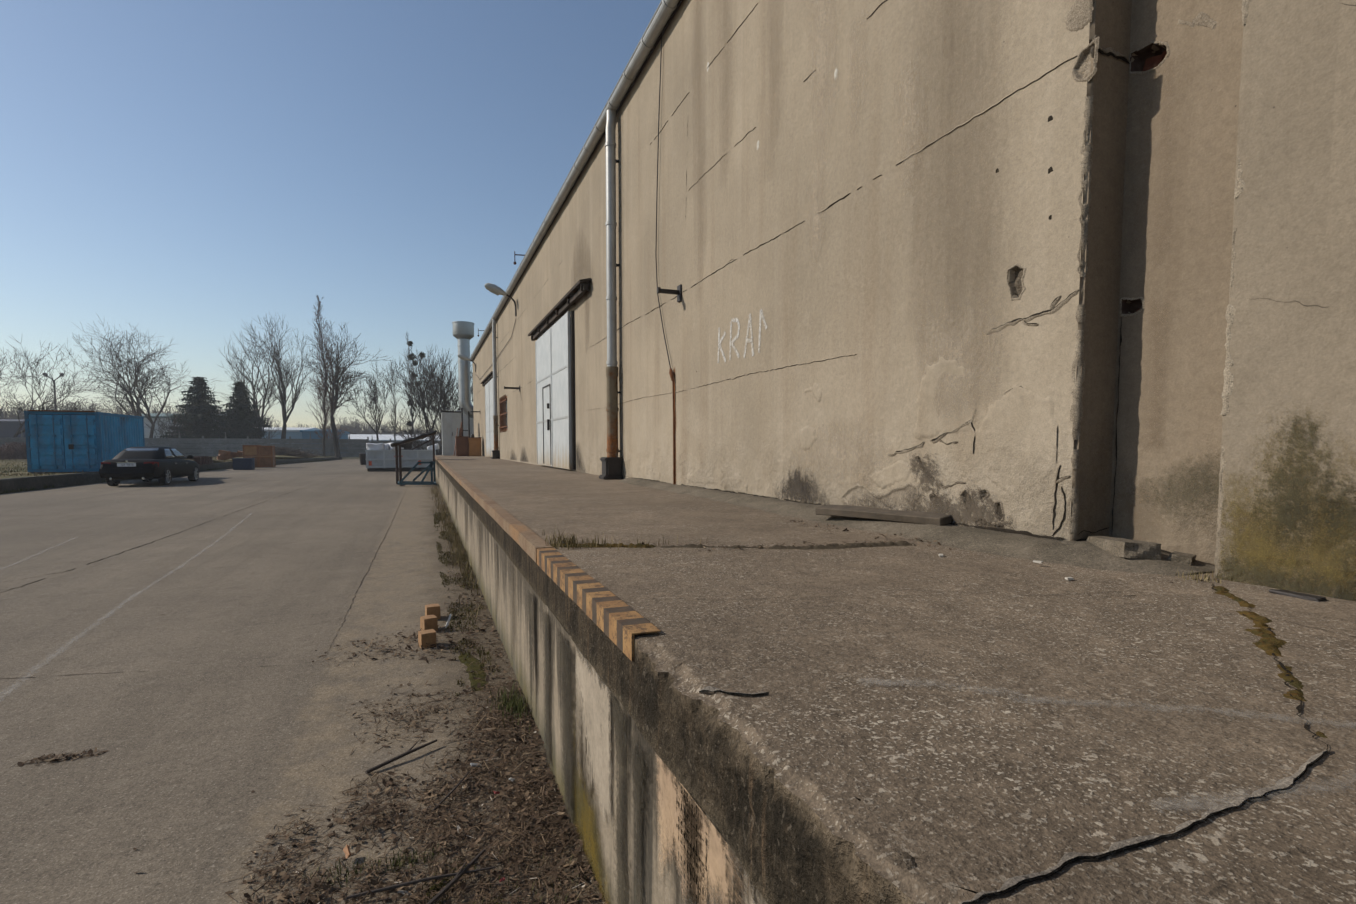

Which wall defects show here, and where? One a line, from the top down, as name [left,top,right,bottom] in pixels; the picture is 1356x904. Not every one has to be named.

spalling [1129,40,1170,75]
crack [590,35,1130,347]
spalling [1006,263,1027,301]
crack [887,409,976,489]
crack [950,317,1122,541]
crack [625,476,821,505]
damp [844,453,1014,532]
damp [512,573,754,904]
crack [959,583,1355,904]